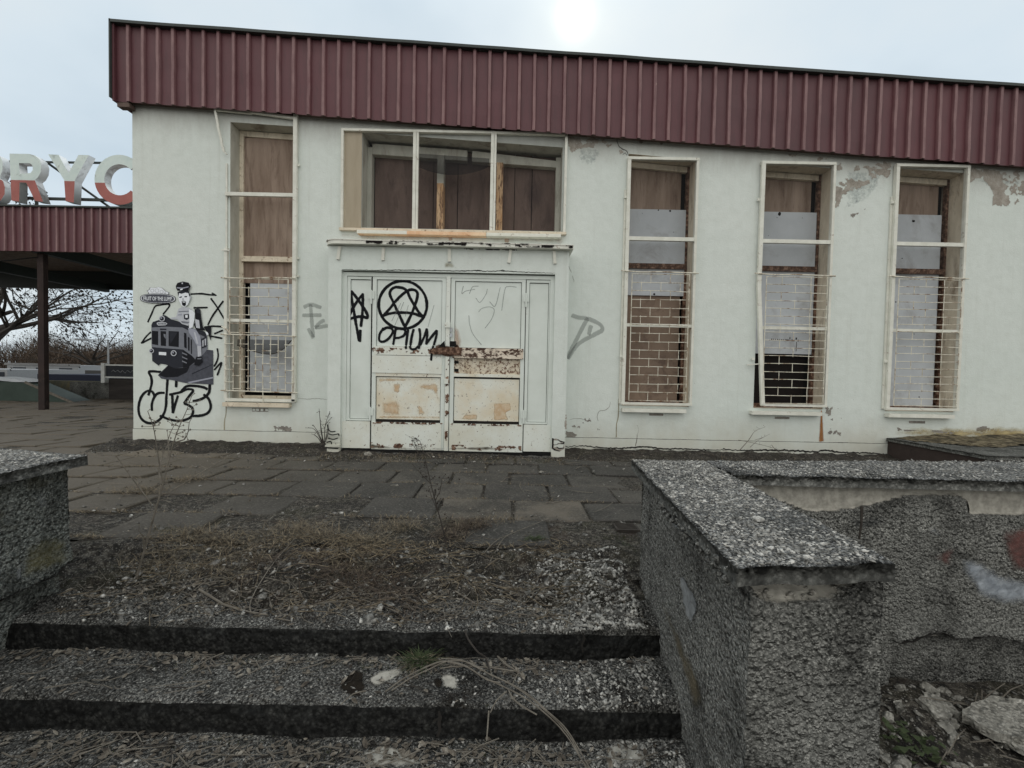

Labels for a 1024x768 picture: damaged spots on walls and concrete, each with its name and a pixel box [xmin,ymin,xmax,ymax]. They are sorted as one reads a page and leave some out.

peeling [568,136,623,154]
peeling [817,157,891,208]
peeling [970,168,1024,206]
peeling [418,241,573,251]
peeling [370,359,521,451]